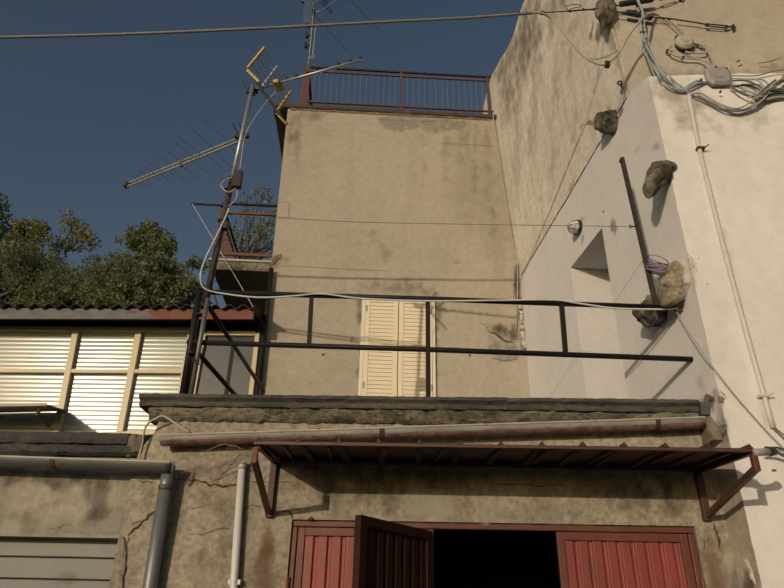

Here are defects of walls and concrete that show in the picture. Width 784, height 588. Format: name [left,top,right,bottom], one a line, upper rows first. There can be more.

crack [481,323,519,362]
crack [176,477,292,488]
crack [126,510,155,550]
crack [702,523,721,550]